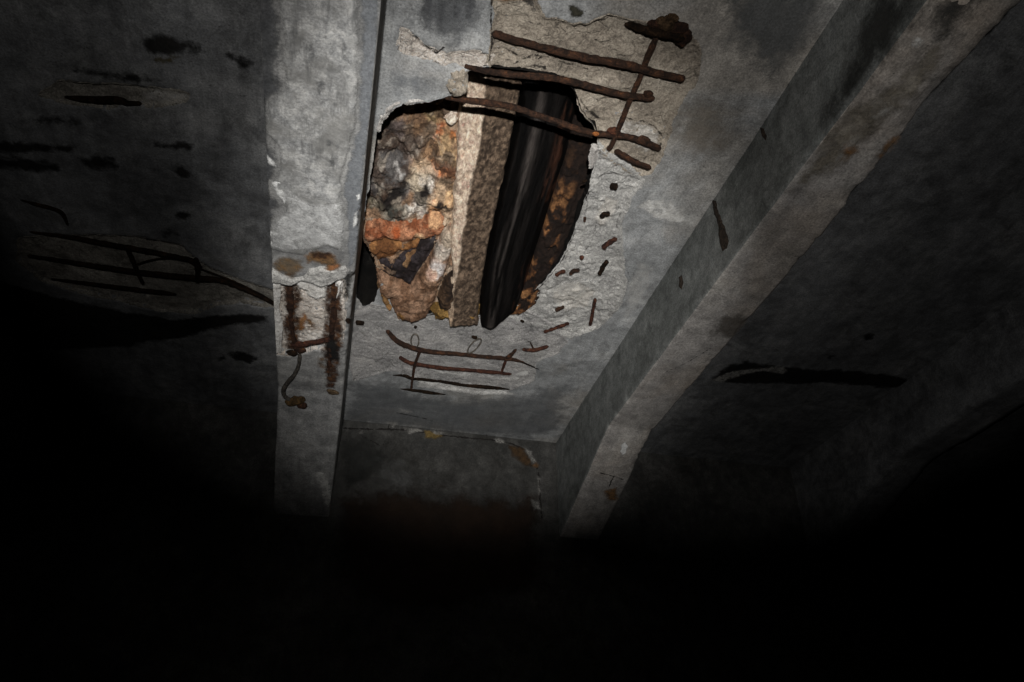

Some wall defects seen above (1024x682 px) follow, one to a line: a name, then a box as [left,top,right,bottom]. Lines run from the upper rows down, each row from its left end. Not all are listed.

rust [274,252,352,388]
spalling [15,0,702,395]